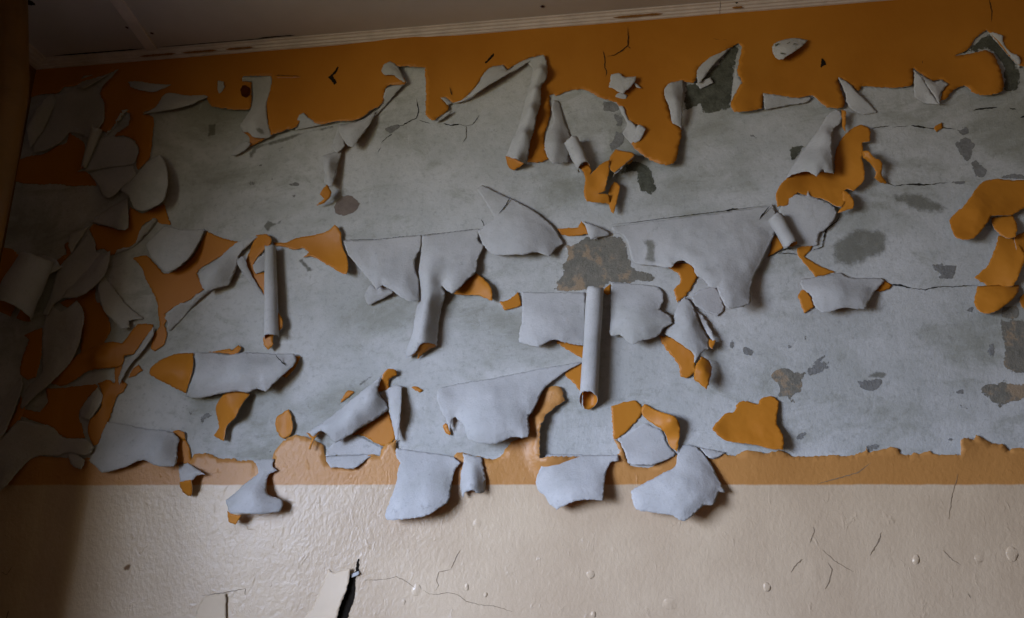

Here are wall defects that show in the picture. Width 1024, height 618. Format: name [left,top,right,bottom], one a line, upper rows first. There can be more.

peeling [231,76,272,156]
peeling [317,61,407,205]
peeling [772,38,808,60]
peeling [914,70,948,105]
peeling [0,83,205,497]
peeling [118,222,301,441]
peeling [344,46,892,444]
peeling [949,127,1024,407]
peeling [226,459,283,525]
peeling [307,369,486,520]
peeling [536,355,829,521]
crack [378,551,512,612]